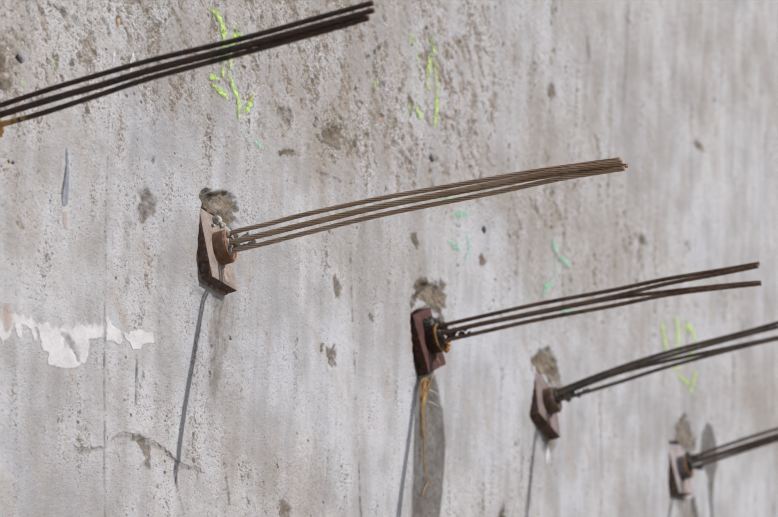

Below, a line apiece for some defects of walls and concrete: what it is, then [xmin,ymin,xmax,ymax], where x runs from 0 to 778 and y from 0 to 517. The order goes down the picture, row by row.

spalling [199,190,239,230]
spalling [410,277,446,321]
peeling [0,305,155,369]
spalling [531,346,562,388]
leakage [413,374,445,517]